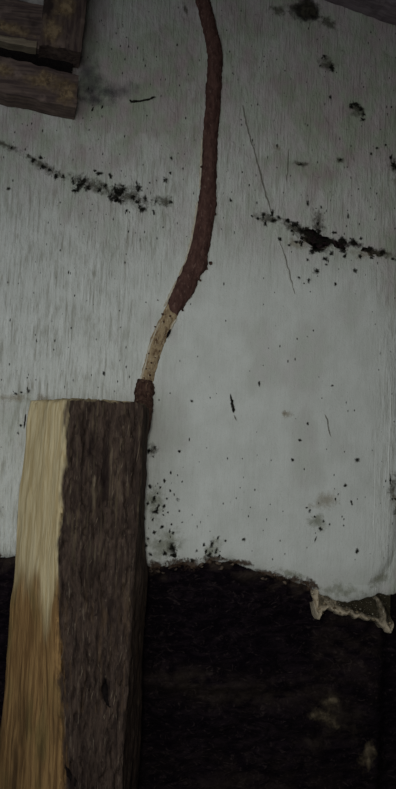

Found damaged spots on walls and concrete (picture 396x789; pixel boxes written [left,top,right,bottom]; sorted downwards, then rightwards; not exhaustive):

leakage [272,0,334,29]
leakage [25,148,173,215]
crack [243,108,295,293]
leakage [251,195,396,292]
leakage [144,471,183,557]
flaking render [0,556,15,726]
flaking render [138,560,396,789]